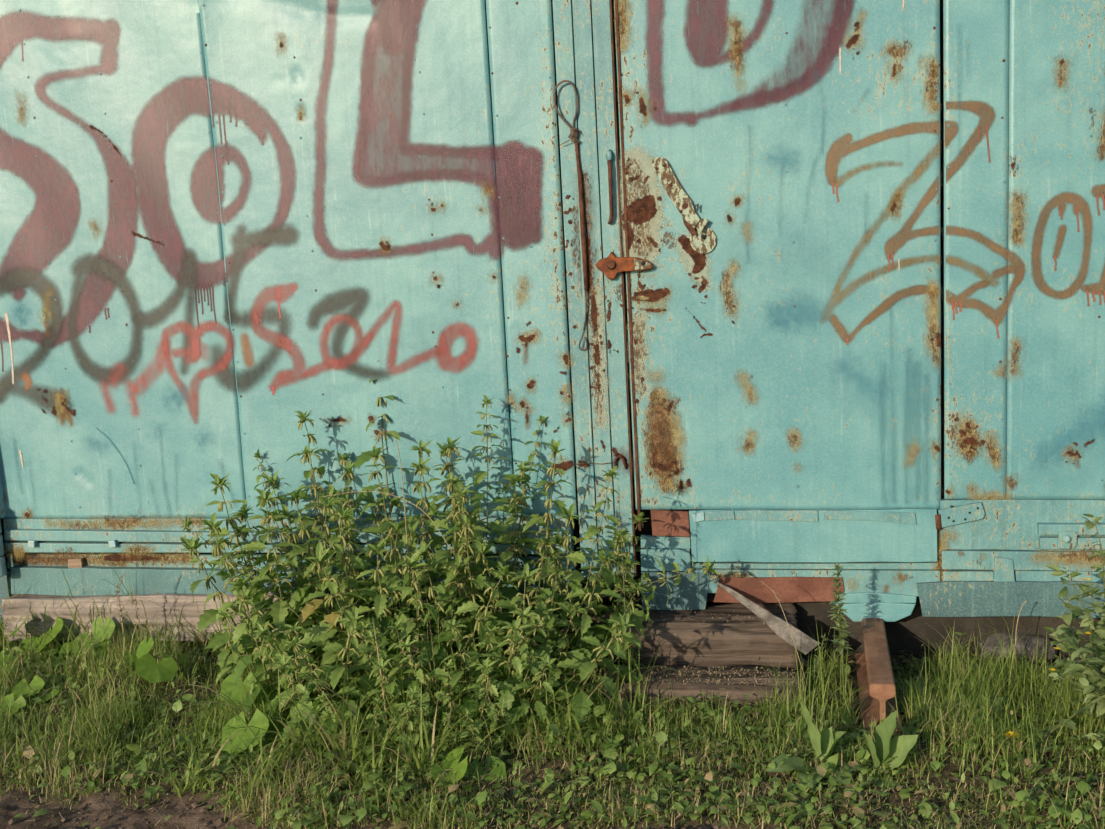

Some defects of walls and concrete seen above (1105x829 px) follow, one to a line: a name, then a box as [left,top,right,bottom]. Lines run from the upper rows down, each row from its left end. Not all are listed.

corrosion [730,17,744,76]
corrosion [886,41,912,77]
corrosion [925,62,939,111]
corrosion [1089,109,1105,159]
peeling [619,147,710,304]
corrosion [562,172,692,493]
corrosion [37,388,75,422]
corrosion [743,431,755,452]
corrosion [908,418,1001,467]
corrosion [1063,439,1095,464]
corrosion [49,509,203,530]
corrosion [4,544,194,567]